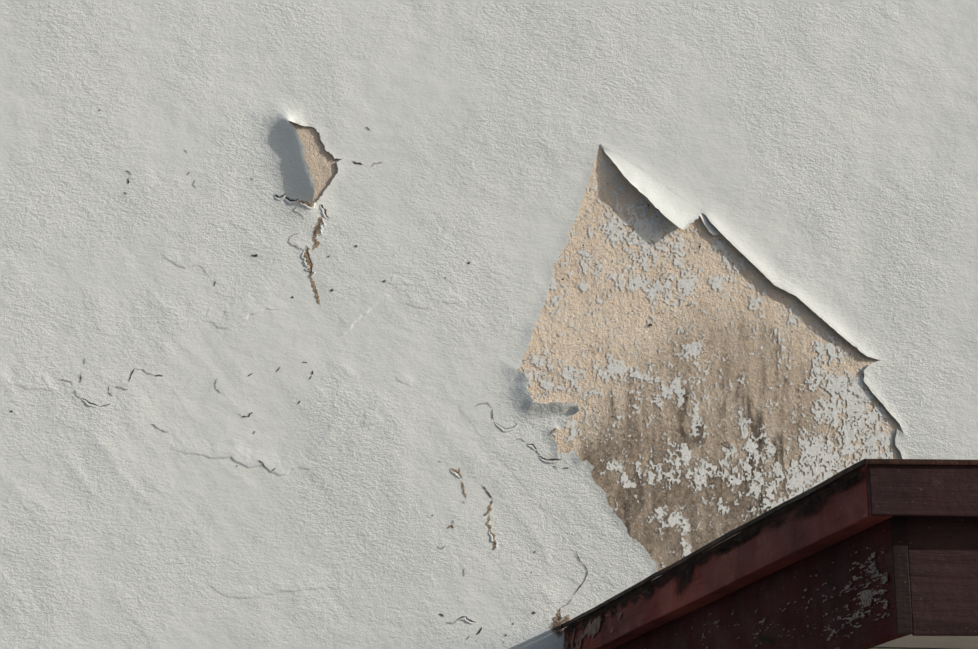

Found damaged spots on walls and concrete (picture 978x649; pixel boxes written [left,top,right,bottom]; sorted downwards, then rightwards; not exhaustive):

crack [274,194,329,304]
peeling [289,121,341,204]
peeling [516,144,903,571]
crack [437,388,588,618]
leakage [573,391,863,632]
spalling [753,545,889,649]